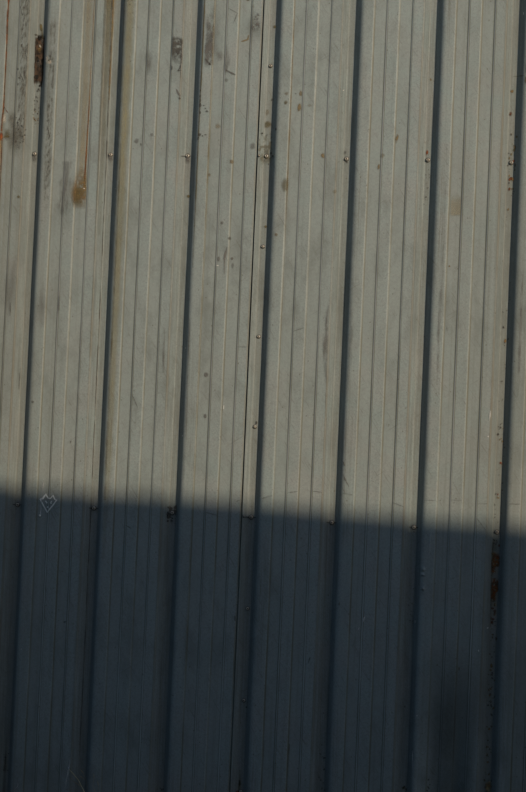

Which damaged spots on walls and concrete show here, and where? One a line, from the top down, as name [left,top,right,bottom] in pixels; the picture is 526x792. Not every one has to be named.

rust [0,0,10,178]
rust [75,93,90,200]